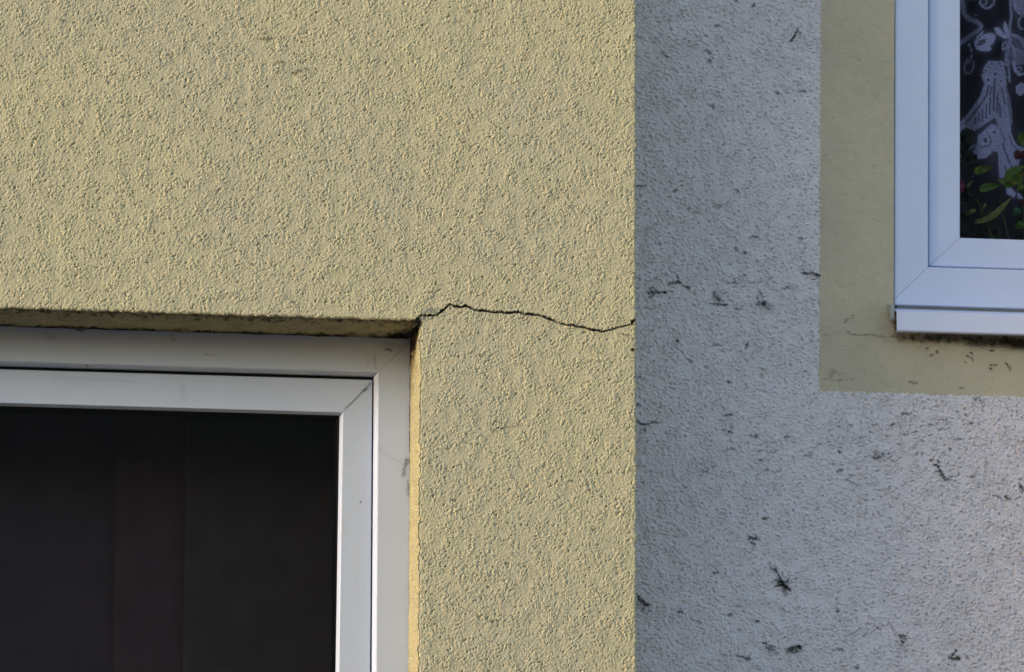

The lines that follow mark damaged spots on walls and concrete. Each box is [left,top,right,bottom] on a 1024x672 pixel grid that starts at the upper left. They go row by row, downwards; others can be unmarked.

crack [417,304,633,333]